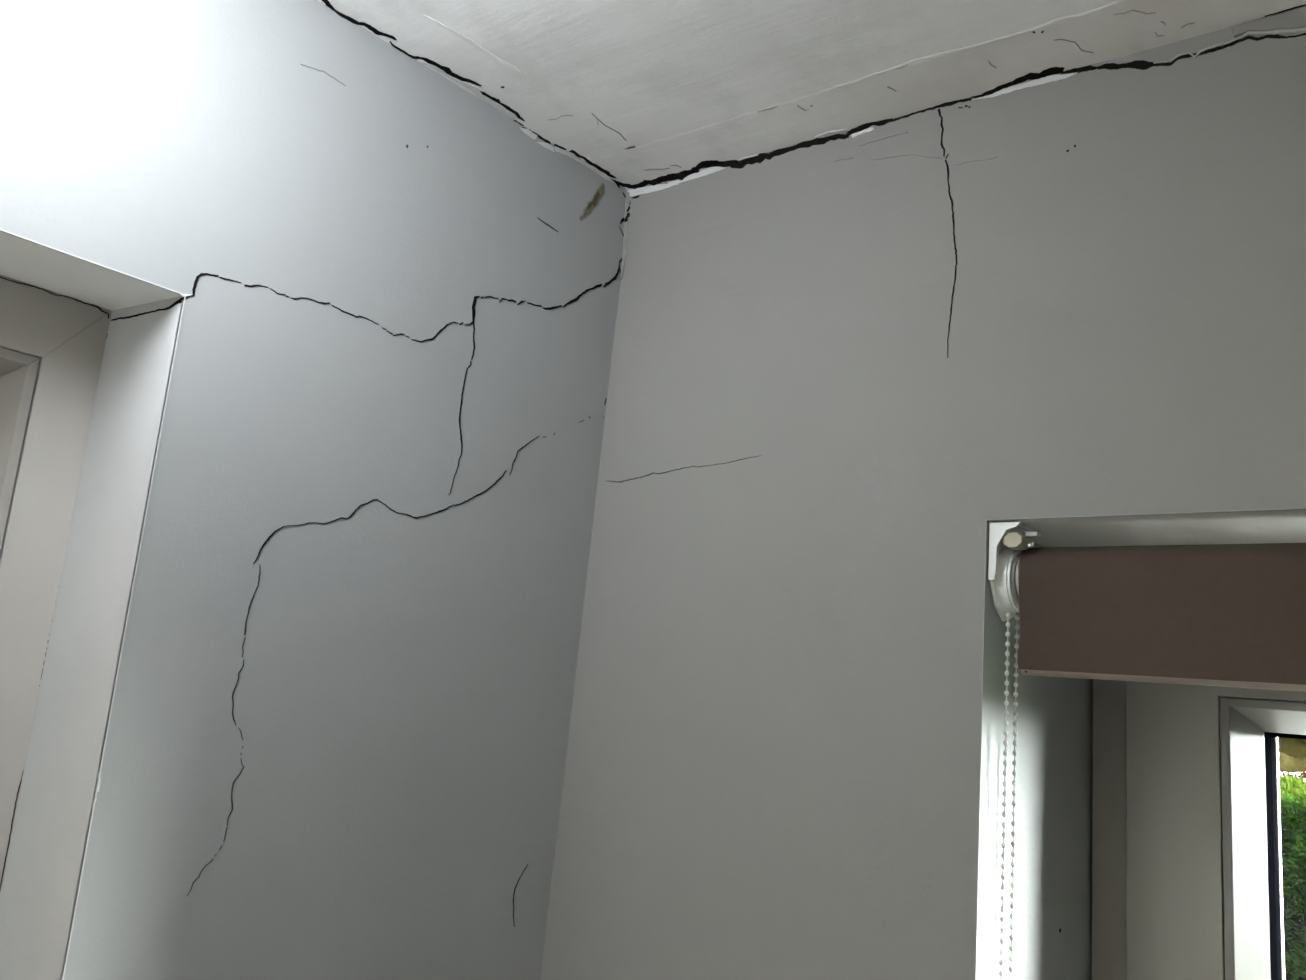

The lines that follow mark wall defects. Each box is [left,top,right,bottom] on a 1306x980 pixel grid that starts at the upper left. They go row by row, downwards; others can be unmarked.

crack [111,0,1306,495]
crack [187,433,555,896]
crack [513,864,528,927]